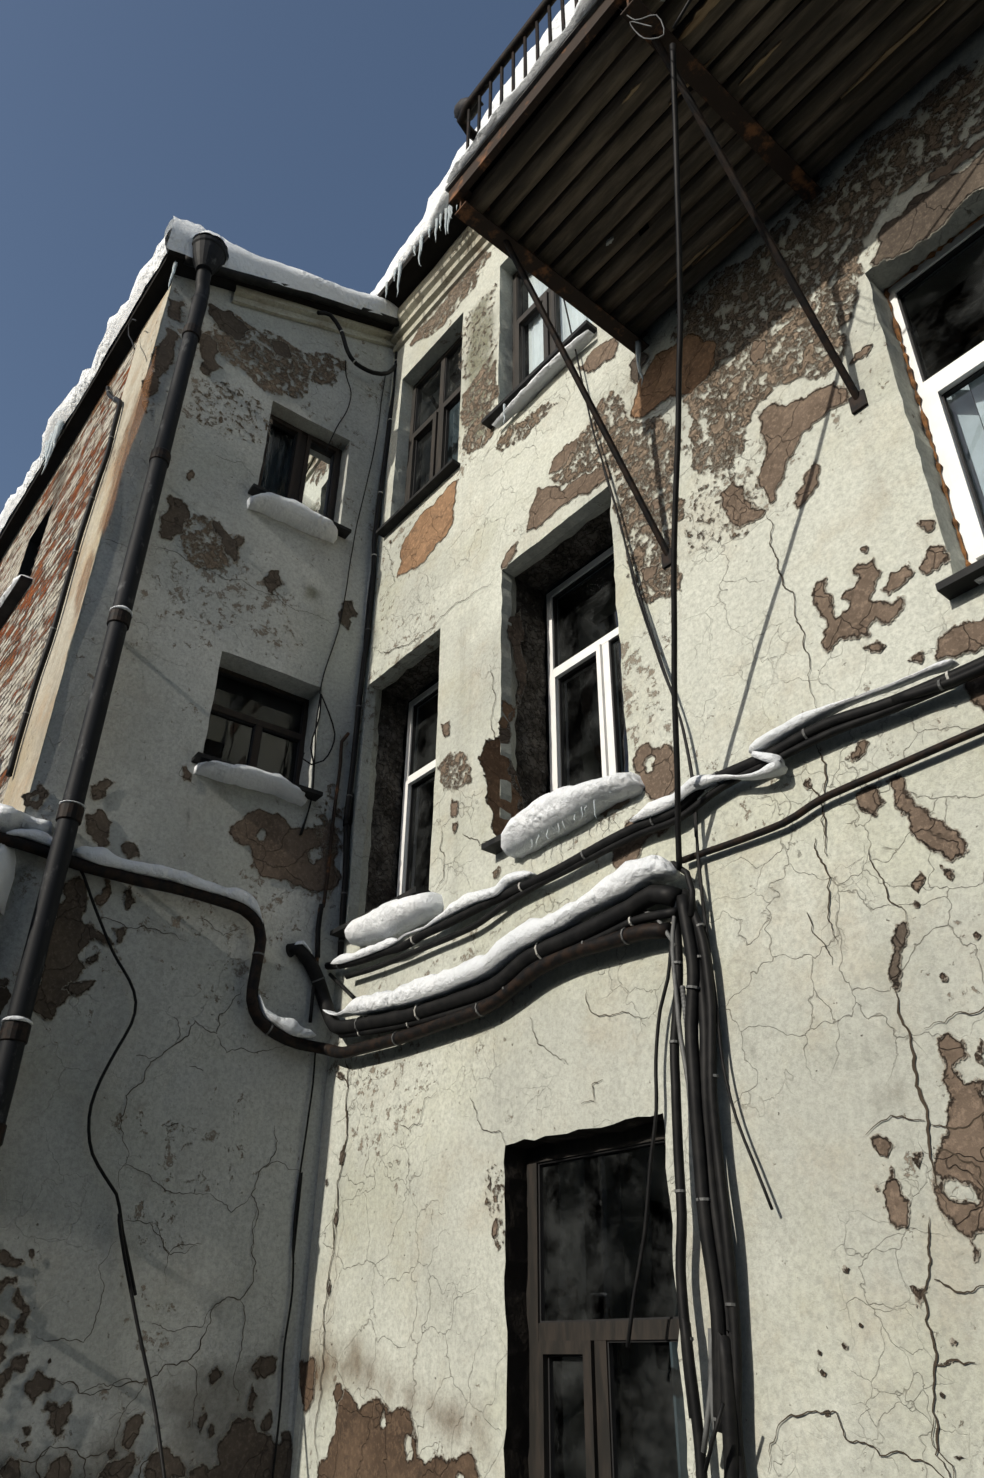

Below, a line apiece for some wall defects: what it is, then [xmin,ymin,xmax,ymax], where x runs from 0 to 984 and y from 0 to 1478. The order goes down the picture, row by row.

flaking render [501,60,984,604]
crack [705,306,816,707]
flaking render [811,519,951,653]
flaking render [907,617,984,664]
crack [807,744,838,965]
crack [868,850,907,924]
flaking render [854,774,969,991]
crack [20,993,298,1478]
crack [314,1061,349,1478]
crack [768,990,984,1478]
flaking render [869,1031,984,1263]
flaking render [317,1382,479,1478]